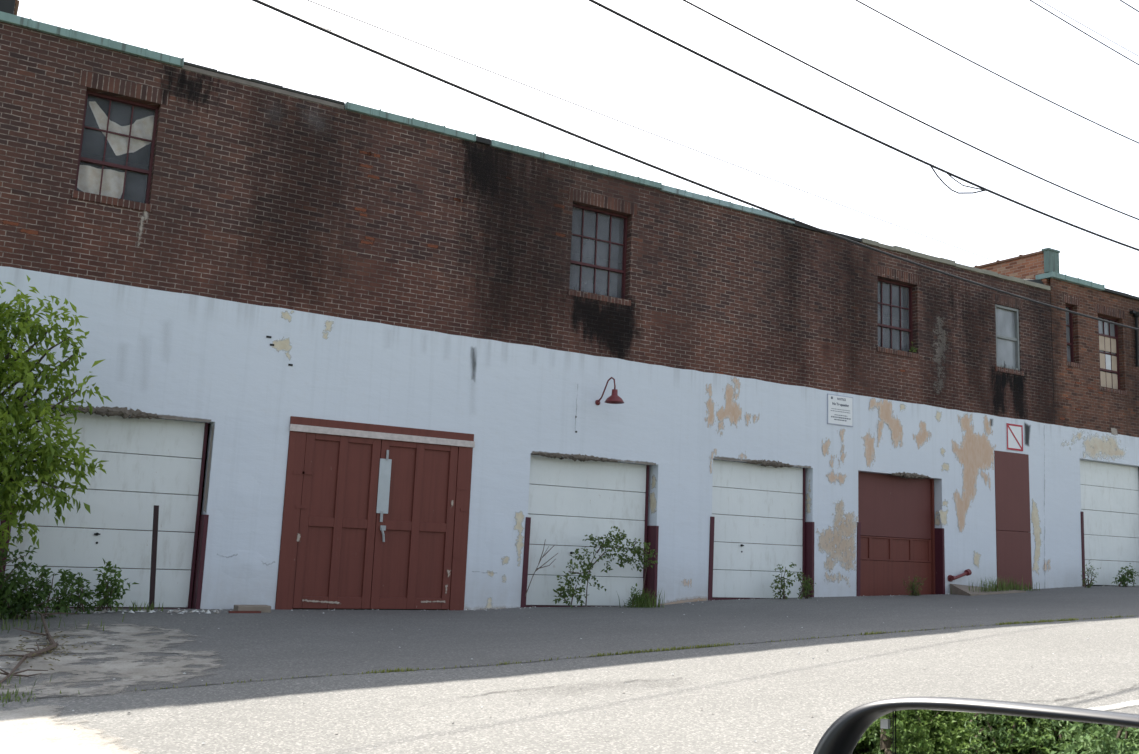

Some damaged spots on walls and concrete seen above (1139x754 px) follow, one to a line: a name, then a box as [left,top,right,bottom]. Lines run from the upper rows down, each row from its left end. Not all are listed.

water stain [161,69,211,105]
peeling [272,337,292,360]
water stain [572,296,638,359]
peeling [705,371,759,436]
spalling [709,449,812,513]
peeling [822,429,846,485]
peeling [863,398,942,468]
peeling [887,413,996,532]
water stain [991,370,1031,446]
peeling [1062,431,1125,462]
peeling [487,511,524,583]
peeling [817,500,858,584]